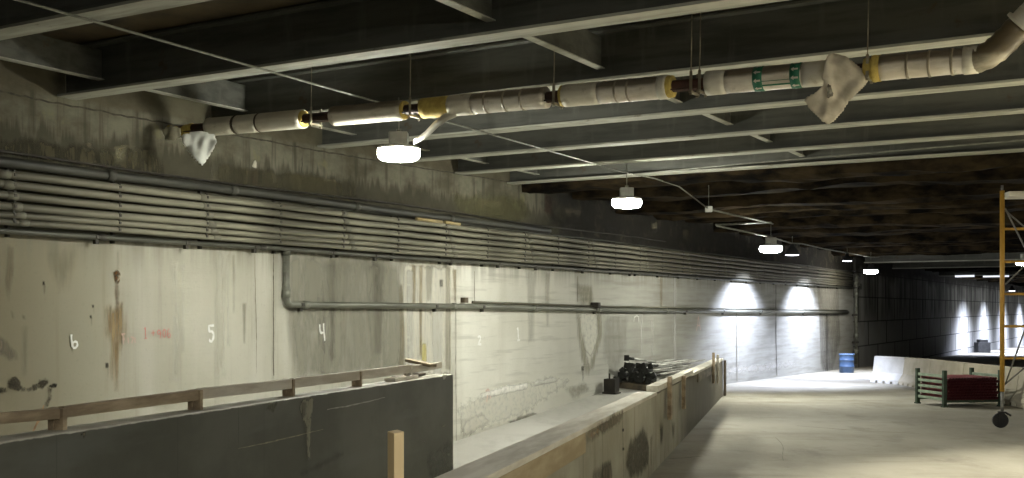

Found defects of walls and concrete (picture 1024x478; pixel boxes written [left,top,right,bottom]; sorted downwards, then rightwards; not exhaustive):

leakage [0,139,164,177]
rust [109,270,122,363]
leakage [627,426,673,478]